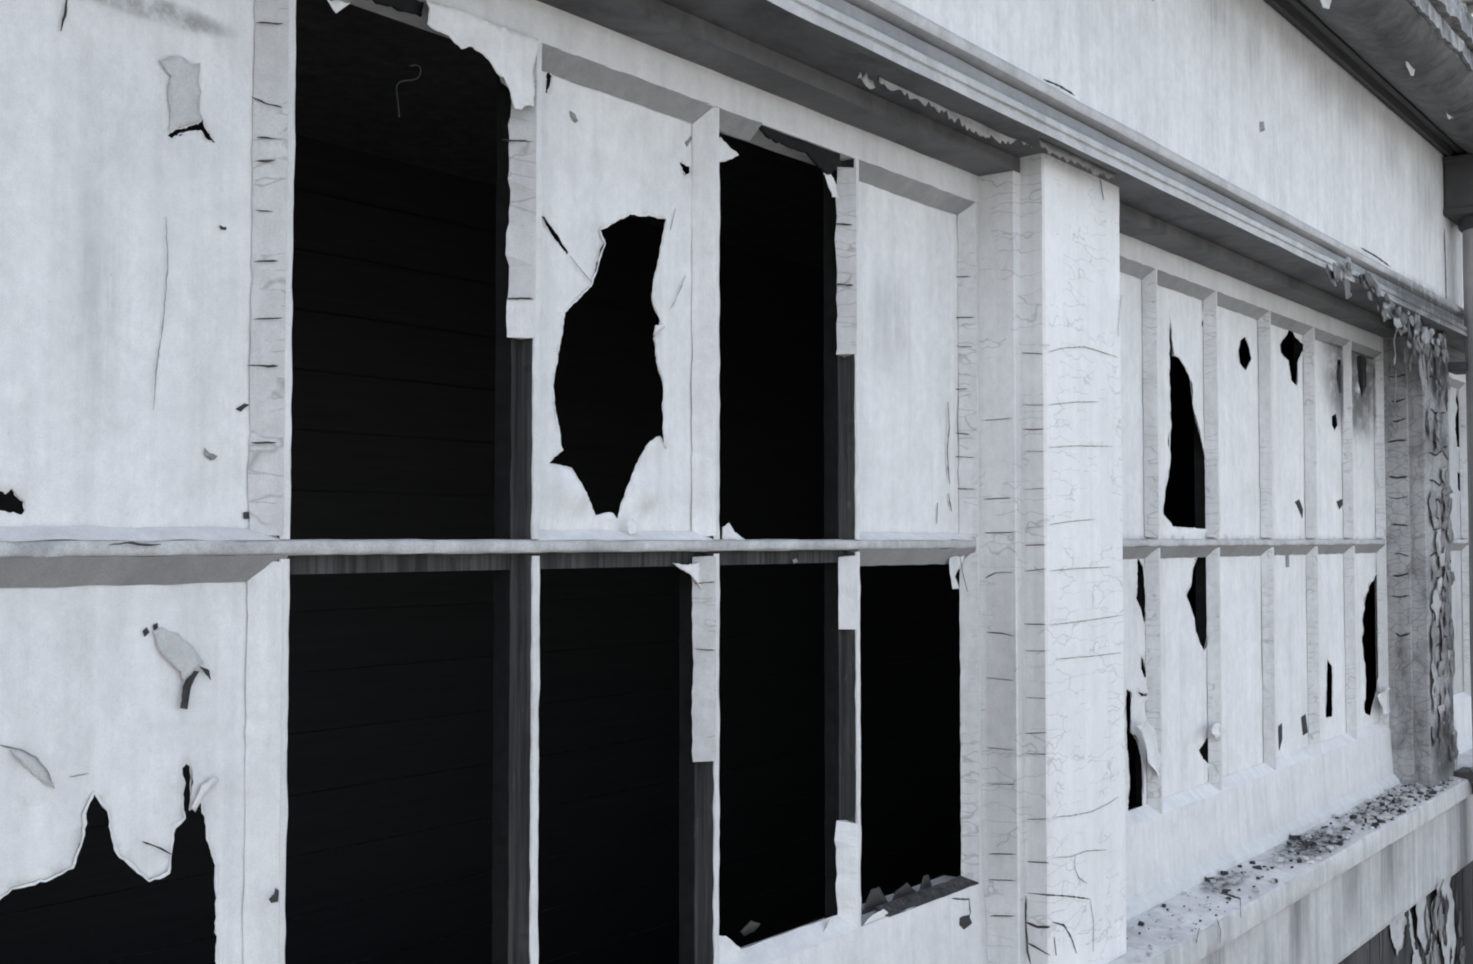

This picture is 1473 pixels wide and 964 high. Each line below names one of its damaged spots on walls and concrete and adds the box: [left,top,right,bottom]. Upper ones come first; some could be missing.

crack [153,221,168,410]
crack [936,388,1113,592]
peeling [1324,256,1459,768]
crack [986,615,1121,785]
crack [1028,797,1118,820]
crack [952,850,1101,964]
peeling [1390,877,1466,964]